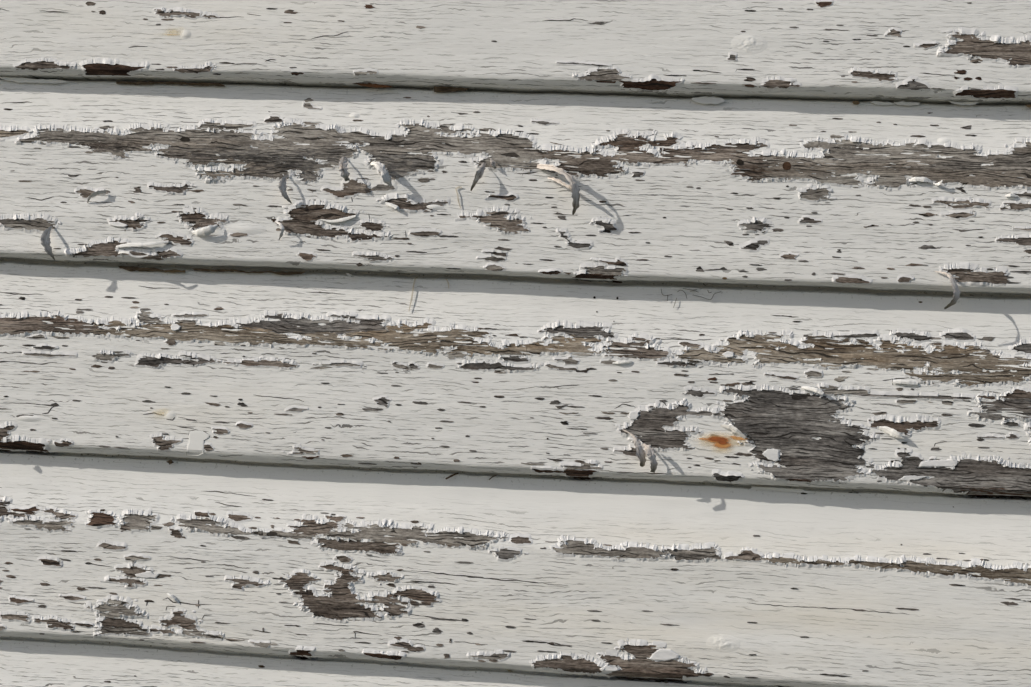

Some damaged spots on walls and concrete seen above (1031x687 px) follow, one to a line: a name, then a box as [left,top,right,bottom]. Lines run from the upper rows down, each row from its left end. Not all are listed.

peeling [884,27,902,37]
peeling [913,27,1031,99]
peeling [0,98,1031,272]
peeling [538,216,629,285]
peeling [897,262,1031,287]
peeling [0,307,1031,503]
rust [699,436,747,448]
peeling [0,496,533,649]
peeling [550,534,1031,588]
peeling [288,645,317,661]
peeling [362,638,426,664]
peeling [524,638,711,686]